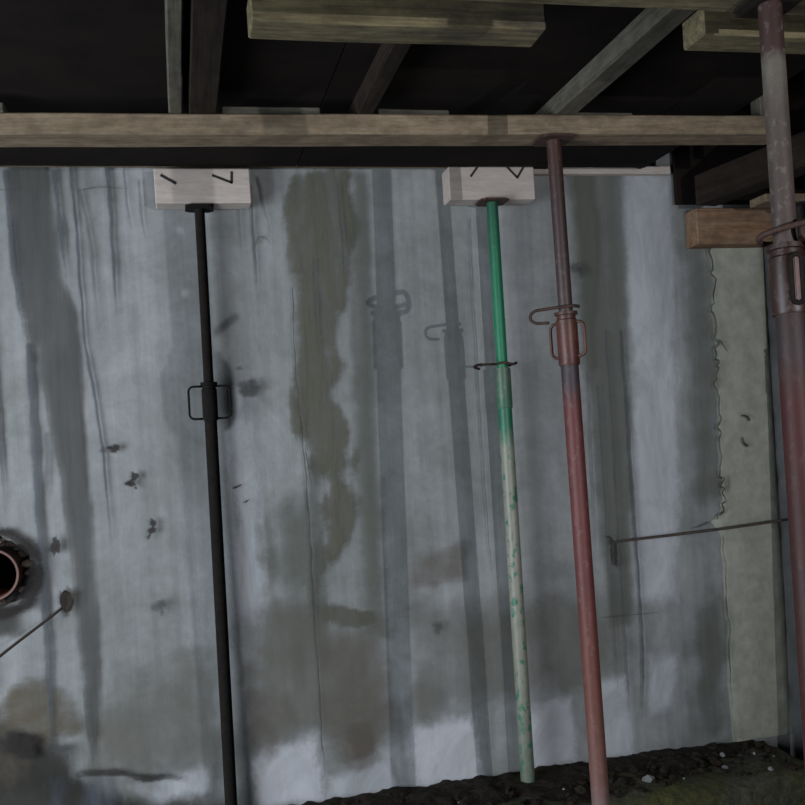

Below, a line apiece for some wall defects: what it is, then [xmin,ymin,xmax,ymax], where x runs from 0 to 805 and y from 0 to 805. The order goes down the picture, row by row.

spalling [239,379,261,396]
crack [697,248,728,527]
leakage [224,168,380,684]
leakage [3,167,108,759]
spalling [125,471,139,489]
leakage [571,176,680,757]
spalling [0,528,60,619]
leakage [0,732,97,805]
leakage [138,768,210,798]
efflorescence [253,736,395,805]
efflorescence [407,718,483,787]
efflorescence [531,699,575,767]